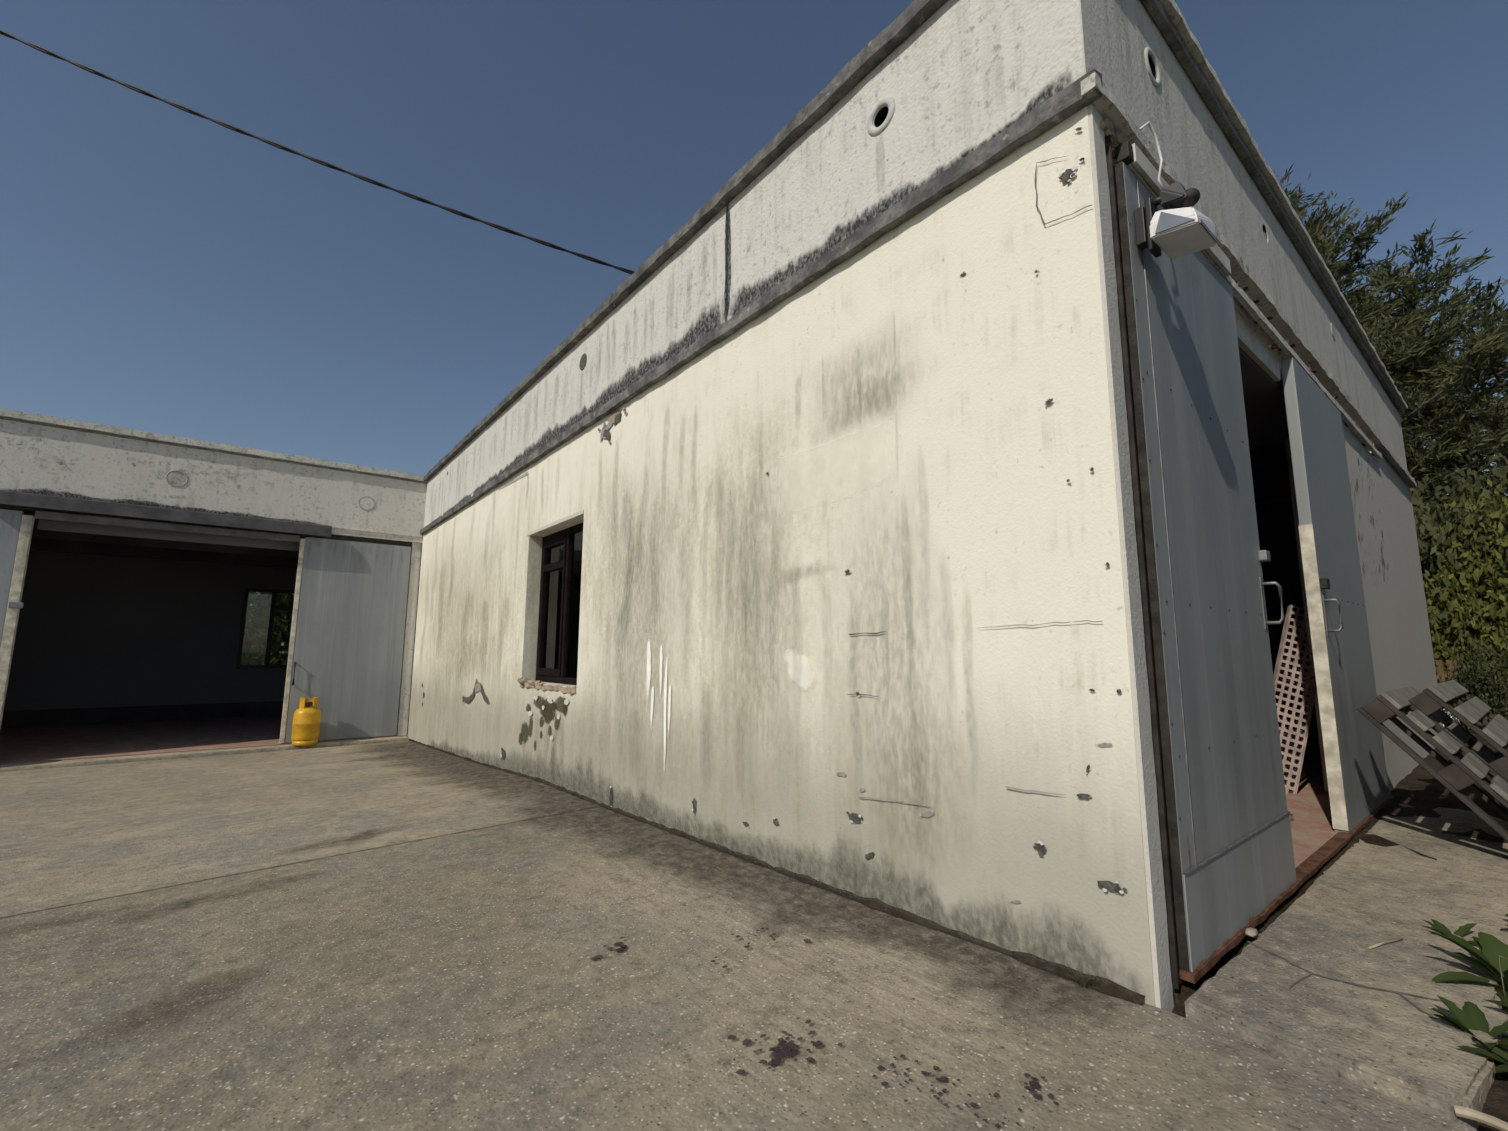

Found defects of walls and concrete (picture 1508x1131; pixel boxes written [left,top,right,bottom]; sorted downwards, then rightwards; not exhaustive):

leakage [439,78,1069,517]
efflorescence [646,641,671,762]
leakage [376,742,1108,1004]